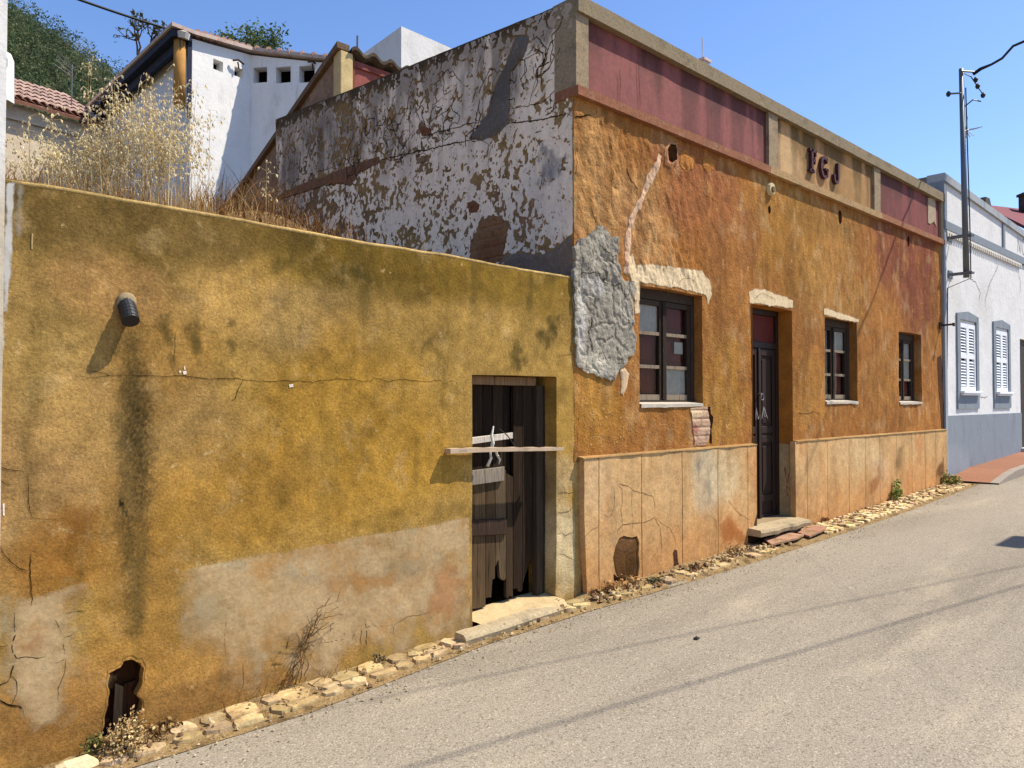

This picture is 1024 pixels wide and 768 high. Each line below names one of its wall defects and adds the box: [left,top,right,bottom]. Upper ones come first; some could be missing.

crack [277,16,589,213]
peeling [276,3,637,395]
spalling [664,142,716,173]
crack [81,333,468,402]
crack [558,484,676,559]
spalling [613,536,638,584]
crack [0,548,78,715]
spalling [102,655,146,738]